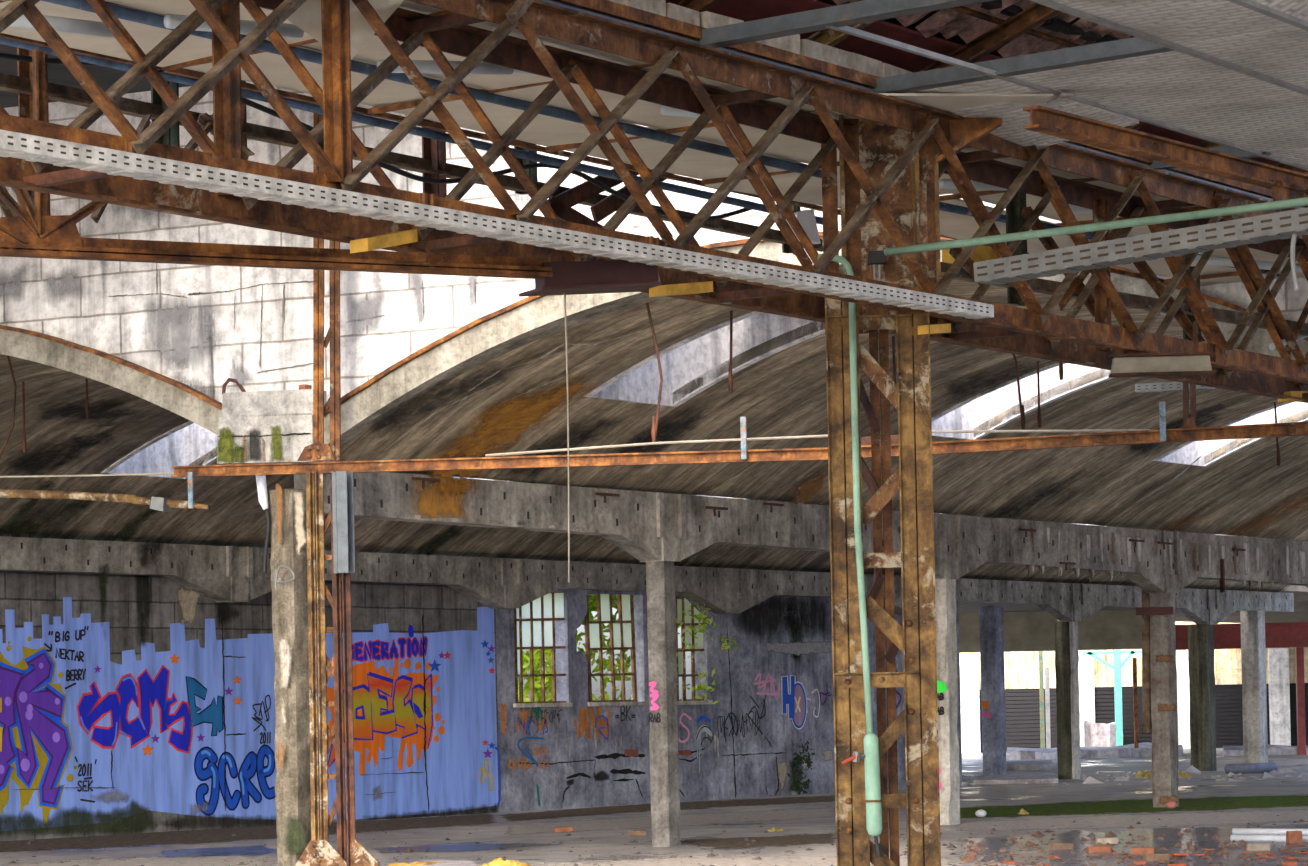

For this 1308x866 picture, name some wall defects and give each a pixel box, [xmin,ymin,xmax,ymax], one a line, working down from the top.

water stain [0,273,21,298]
water stain [47,273,80,297]
water stain [354,295,381,333]
water stain [413,274,424,323]
water stain [153,302,215,398]
water stain [234,365,250,387]
corrosion [416,382,588,520]